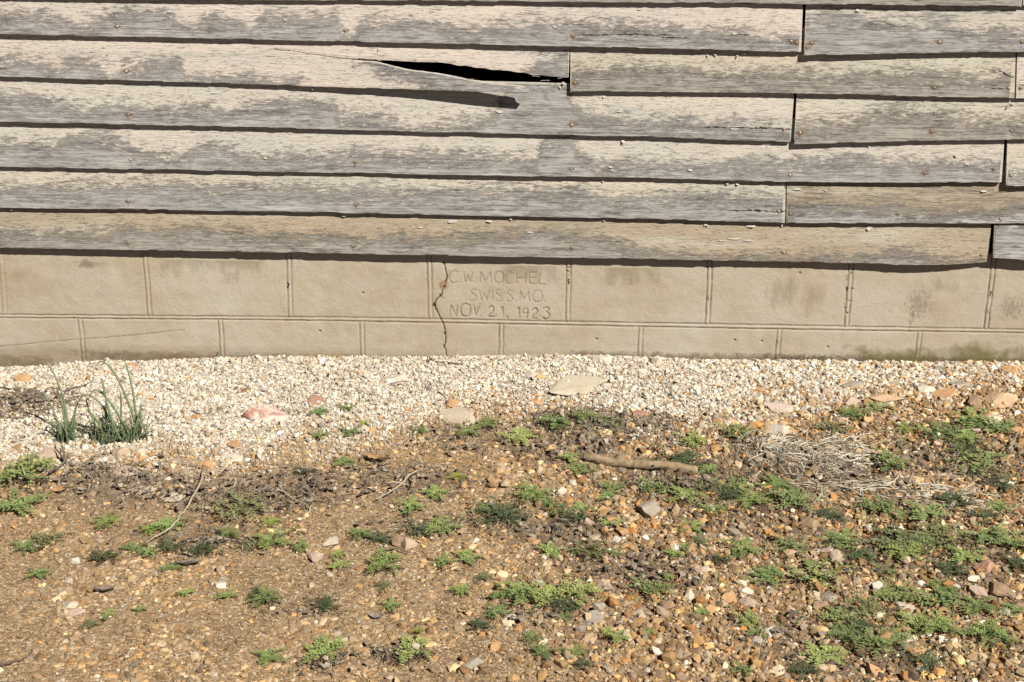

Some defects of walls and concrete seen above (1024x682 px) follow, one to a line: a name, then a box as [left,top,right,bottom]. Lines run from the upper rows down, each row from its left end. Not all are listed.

crack [276,48,382,63]
crack [433,265,448,351]